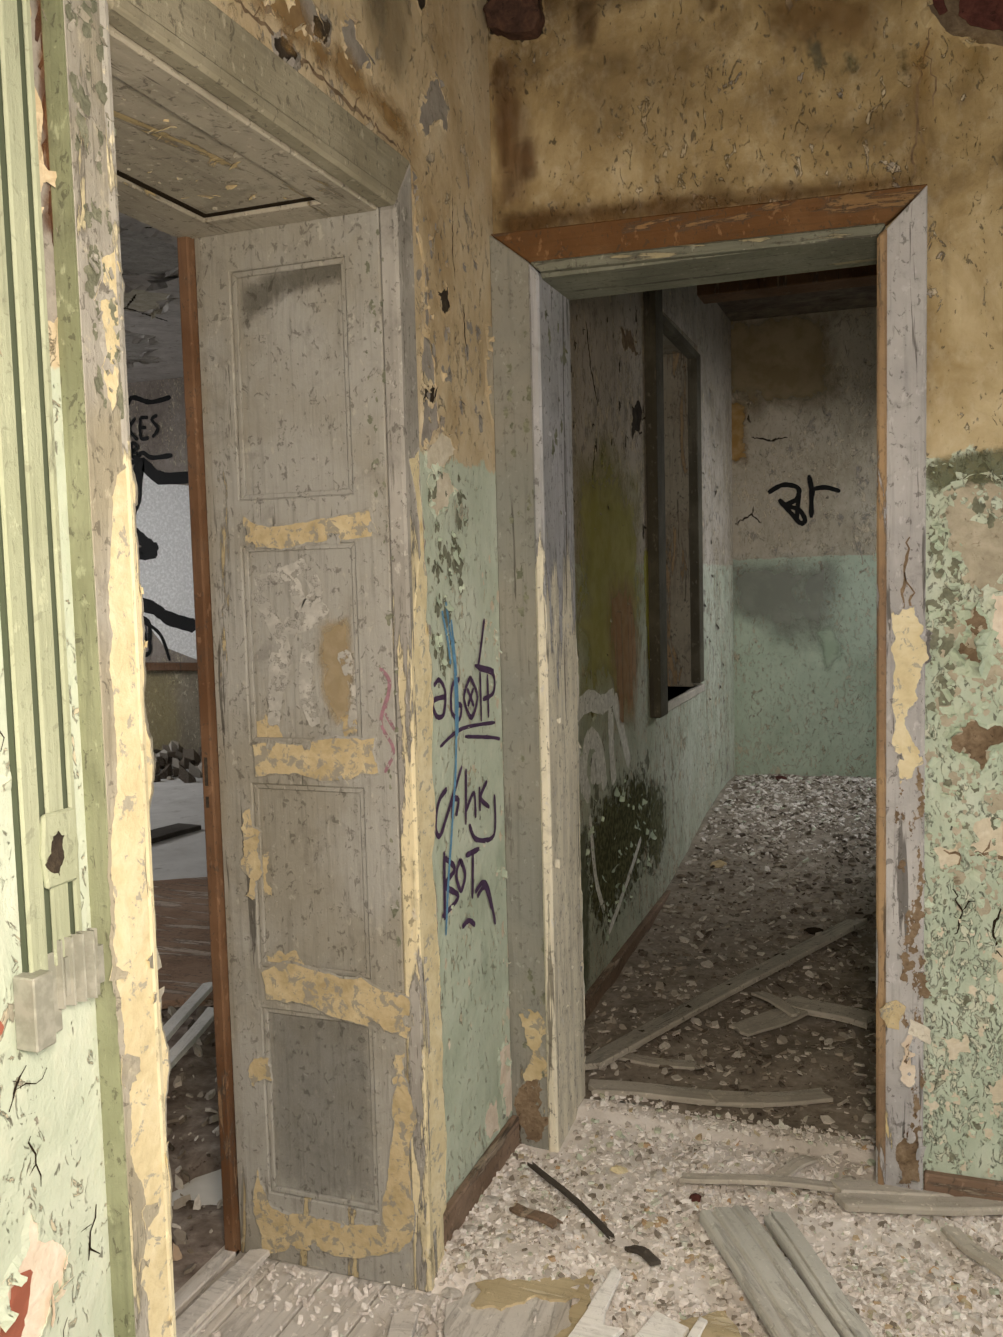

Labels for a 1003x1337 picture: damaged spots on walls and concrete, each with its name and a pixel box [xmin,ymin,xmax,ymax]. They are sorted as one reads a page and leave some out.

crack [235,0,274,36]
damp [776,0,867,69]
spalling [912,0,1003,53]
peeling [30,0,58,331]
crack [300,58,409,159]
damp [504,197,721,232]
peeling [239,165,532,1260]
spalling [45,831,65,876]
peeling [105,463,177,1337]
peeling [879,461,1003,1187]
peeling [484,968,548,1145]
peeling [0,1208,74,1337]